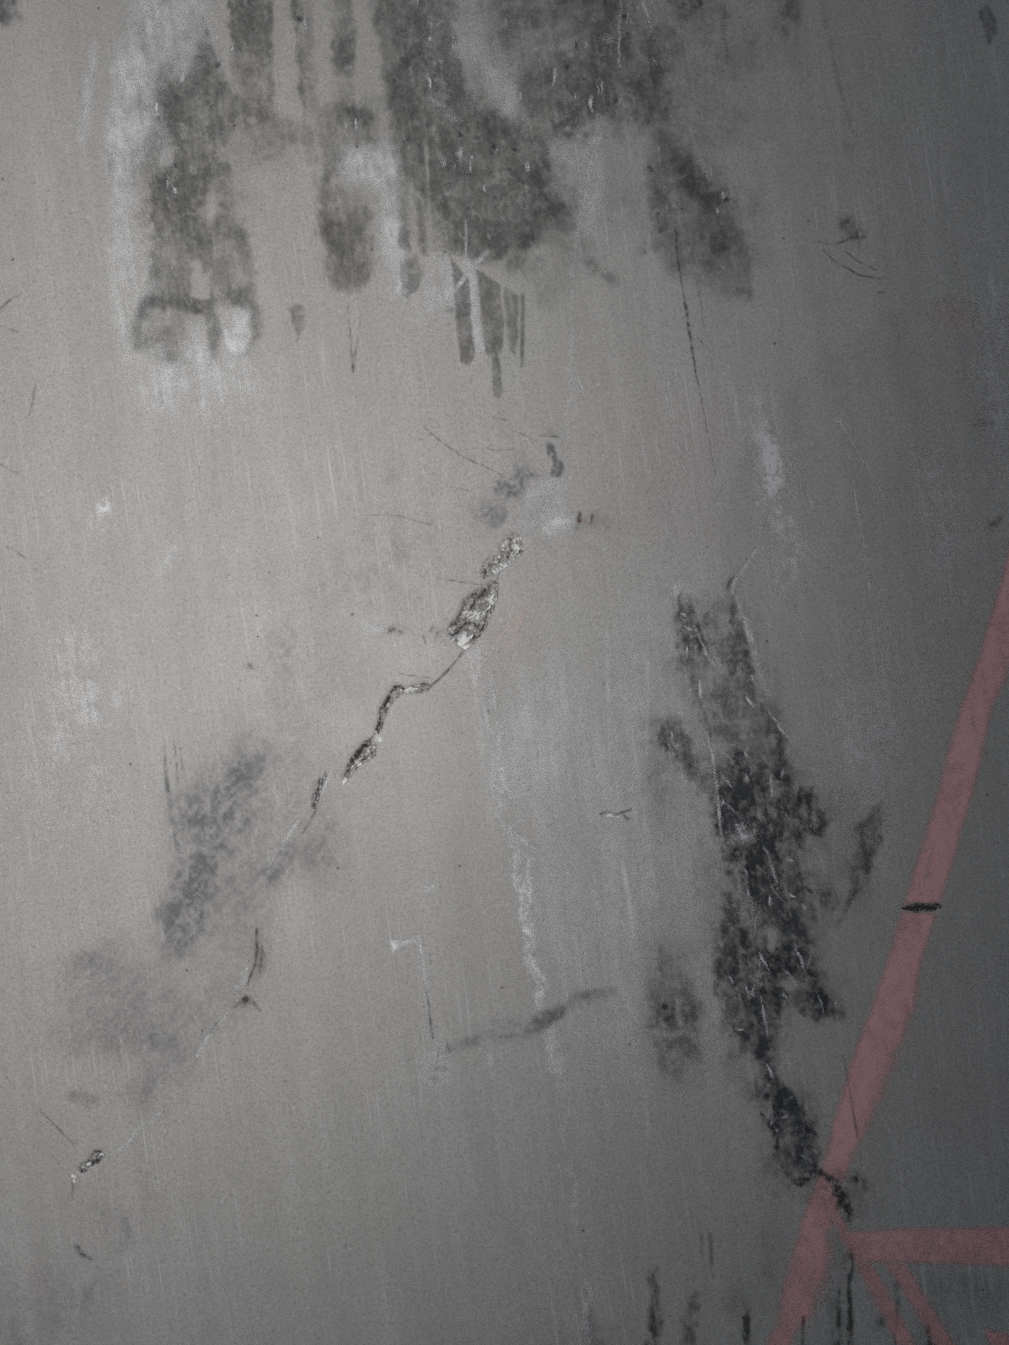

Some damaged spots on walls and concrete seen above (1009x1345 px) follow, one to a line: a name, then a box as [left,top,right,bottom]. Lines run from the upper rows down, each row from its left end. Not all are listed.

damp [75,0,303,449]
damp [334,0,663,475]
damp [670,154,721,212]
crack [197,931,258,1057]
crack [269,770,332,866]
damp [452,498,961,1185]